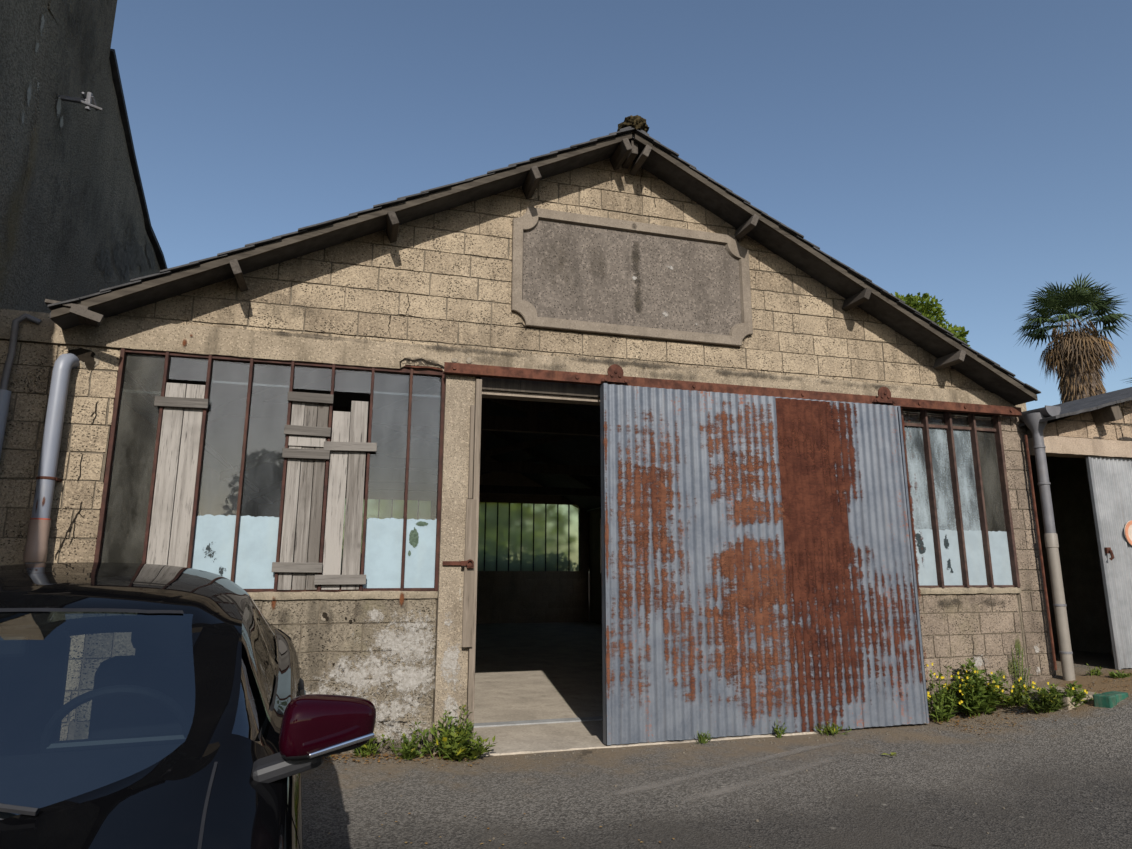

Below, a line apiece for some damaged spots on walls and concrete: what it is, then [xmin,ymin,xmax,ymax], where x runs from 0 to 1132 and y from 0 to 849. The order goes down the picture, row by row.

peeling [305,609,461,744]
rust [603,398,928,733]